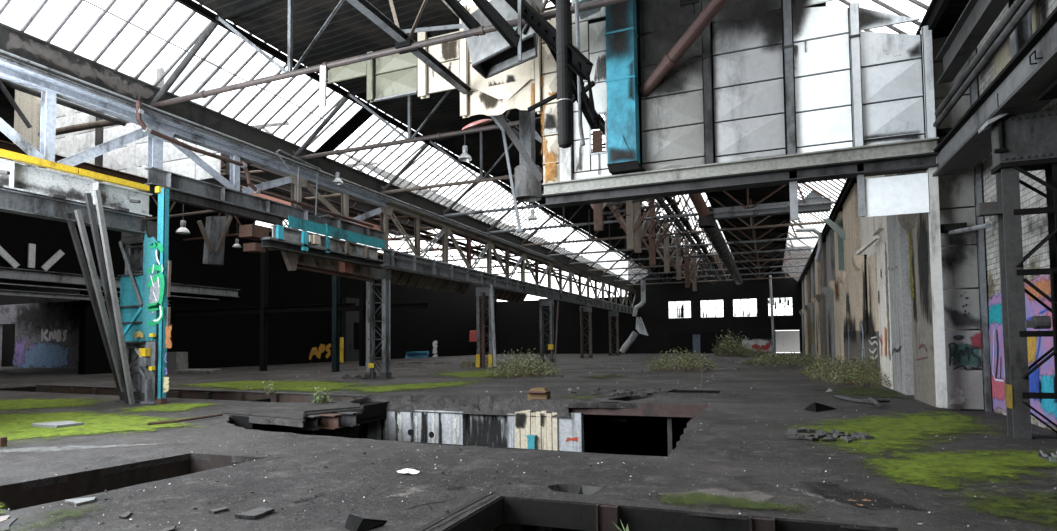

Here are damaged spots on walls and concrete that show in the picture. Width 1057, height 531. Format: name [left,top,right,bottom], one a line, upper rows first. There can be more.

corrosion [530,76,557,183]